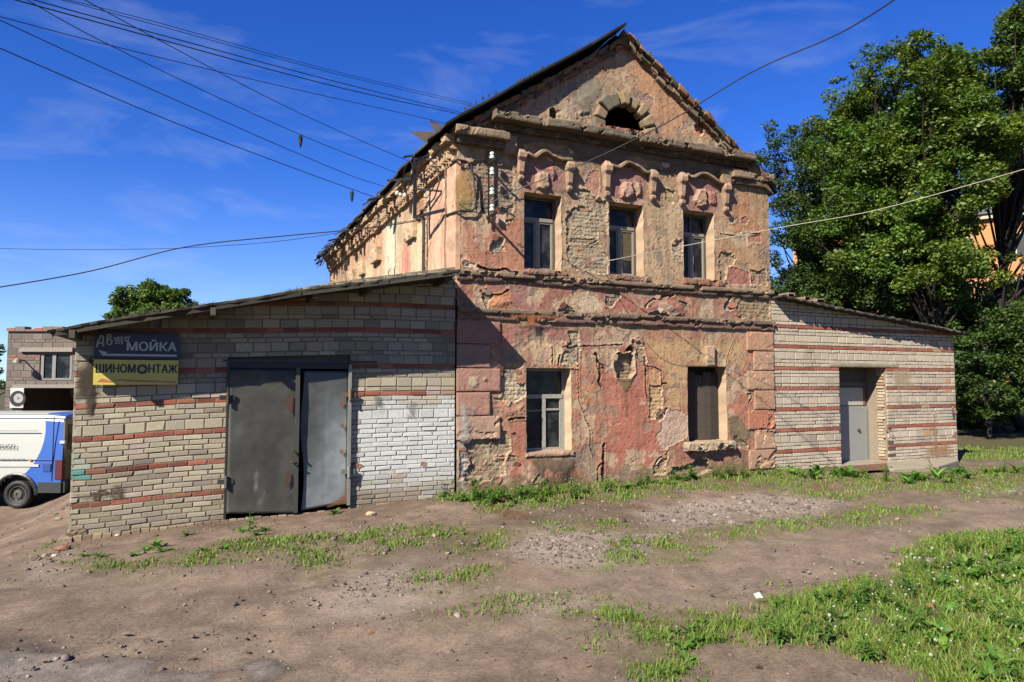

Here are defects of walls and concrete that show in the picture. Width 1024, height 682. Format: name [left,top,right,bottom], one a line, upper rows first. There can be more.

spalling [417,193,425,224]
spalling [458,159,516,252]
spalling [565,170,609,275]
spalling [330,229,382,283]
spalling [558,301,576,312]
spalling [644,293,686,317]
spalling [718,249,771,321]
spalling [493,361,526,407]
spalling [559,330,581,368]
spalling [593,337,648,379]
spalling [458,405,520,489]
peeling [647,384,712,476]